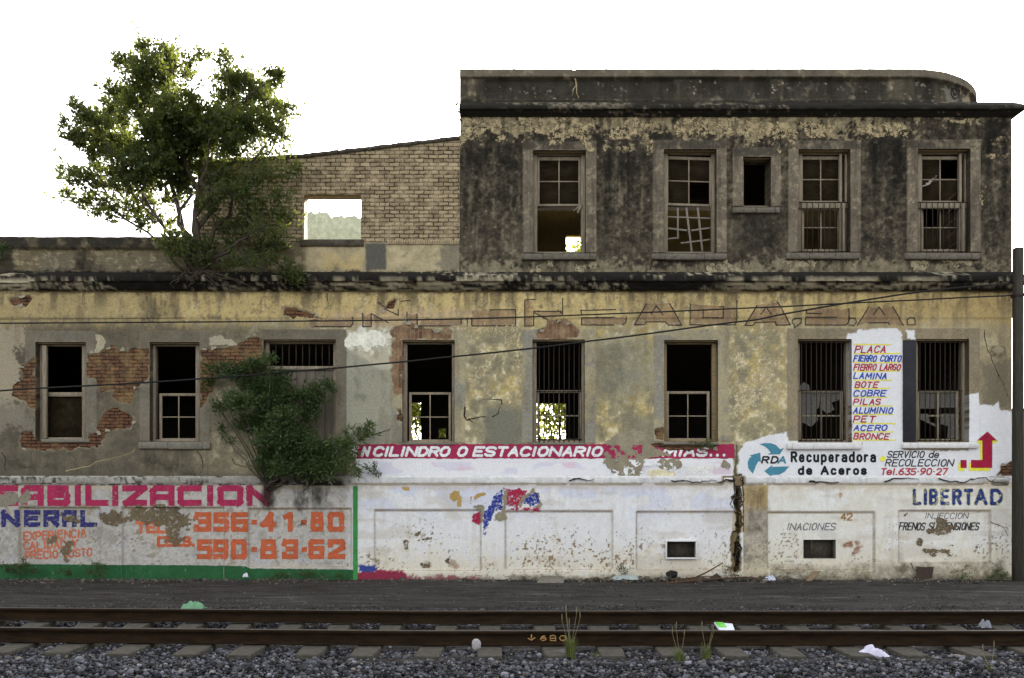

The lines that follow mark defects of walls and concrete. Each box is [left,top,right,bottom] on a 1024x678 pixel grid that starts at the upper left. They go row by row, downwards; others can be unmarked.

spalling [537,319,579,339]
spalling [12,359,36,409]
spalling [19,334,151,451]
spalling [200,335,263,408]
spalling [344,321,452,395]
peeling [603,428,731,478]
spalling [996,461,1012,476]
peeling [47,535,74,563]
peeling [99,504,195,547]
peeling [450,487,543,535]
crack [671,444,744,572]
peeling [916,517,957,557]